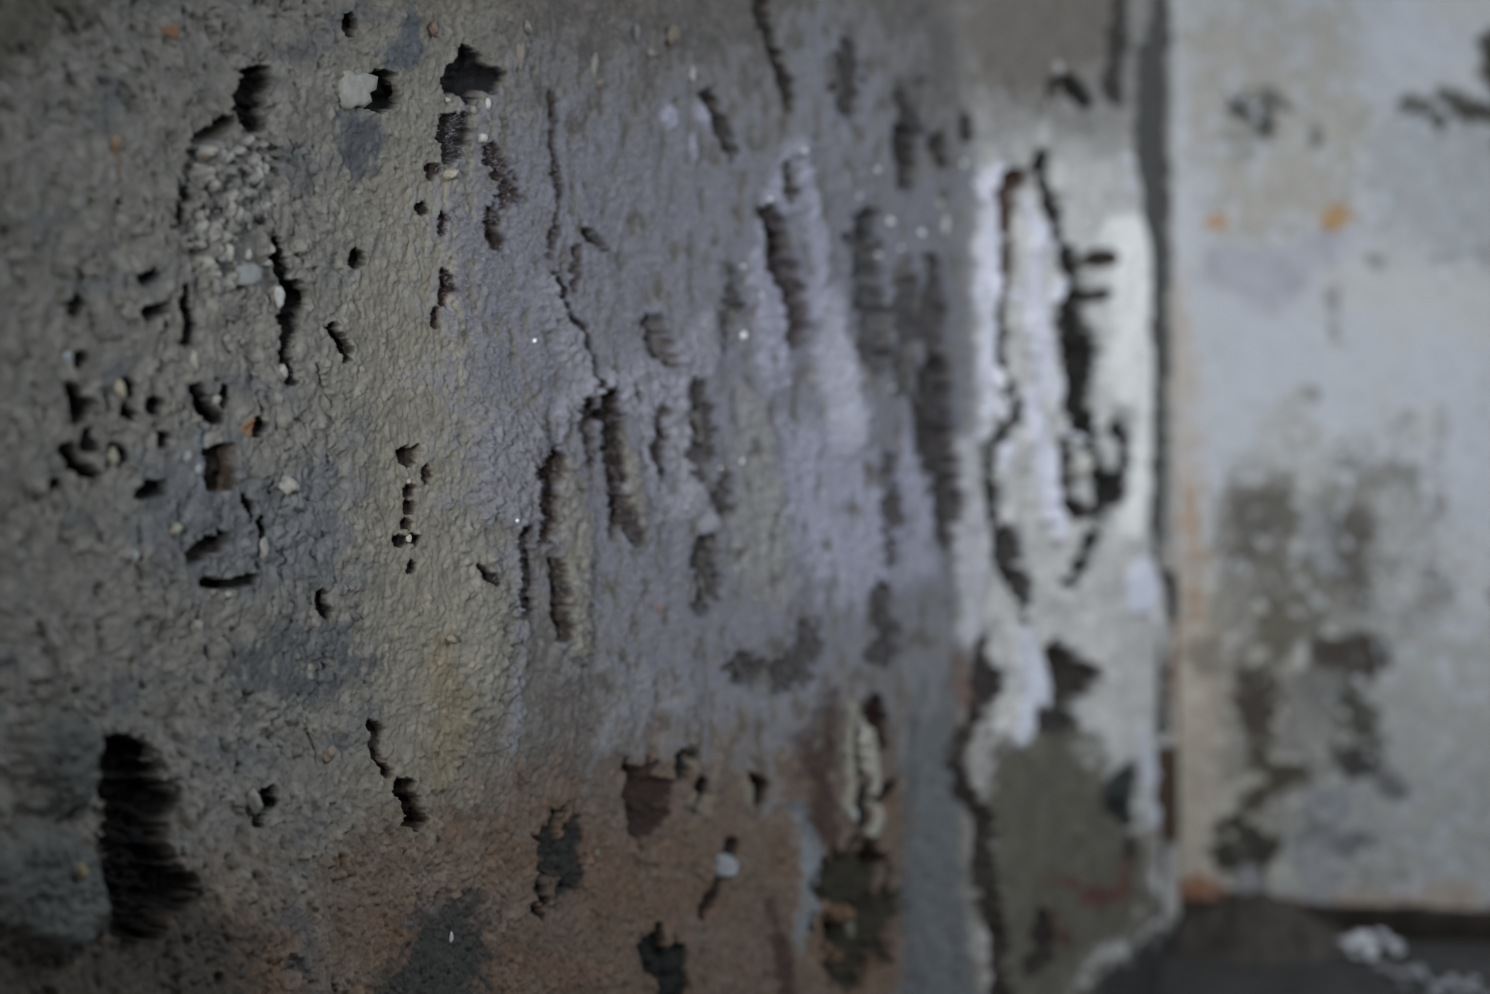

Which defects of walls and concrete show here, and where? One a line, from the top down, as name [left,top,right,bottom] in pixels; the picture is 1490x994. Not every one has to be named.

crack [750,0,797,116]
peeling [968,48,1178,629]
peeling [1196,224,1361,318]
water stain [1319,279,1346,344]
water stain [97,0,1179,994]
flaking render [1009,623,1115,749]
water stain [1178,380,1490,906]